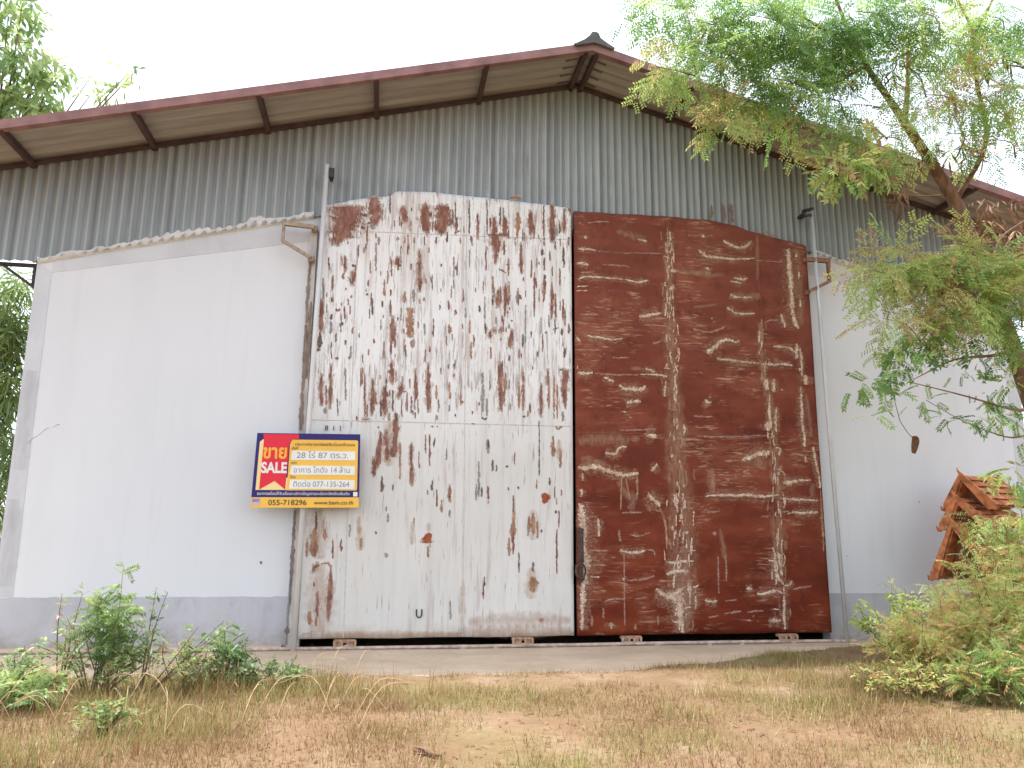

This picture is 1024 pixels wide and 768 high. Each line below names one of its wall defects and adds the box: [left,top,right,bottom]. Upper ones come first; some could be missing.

rust [317,194,571,573]
rust [305,512,362,626]
rust [507,495,543,592]